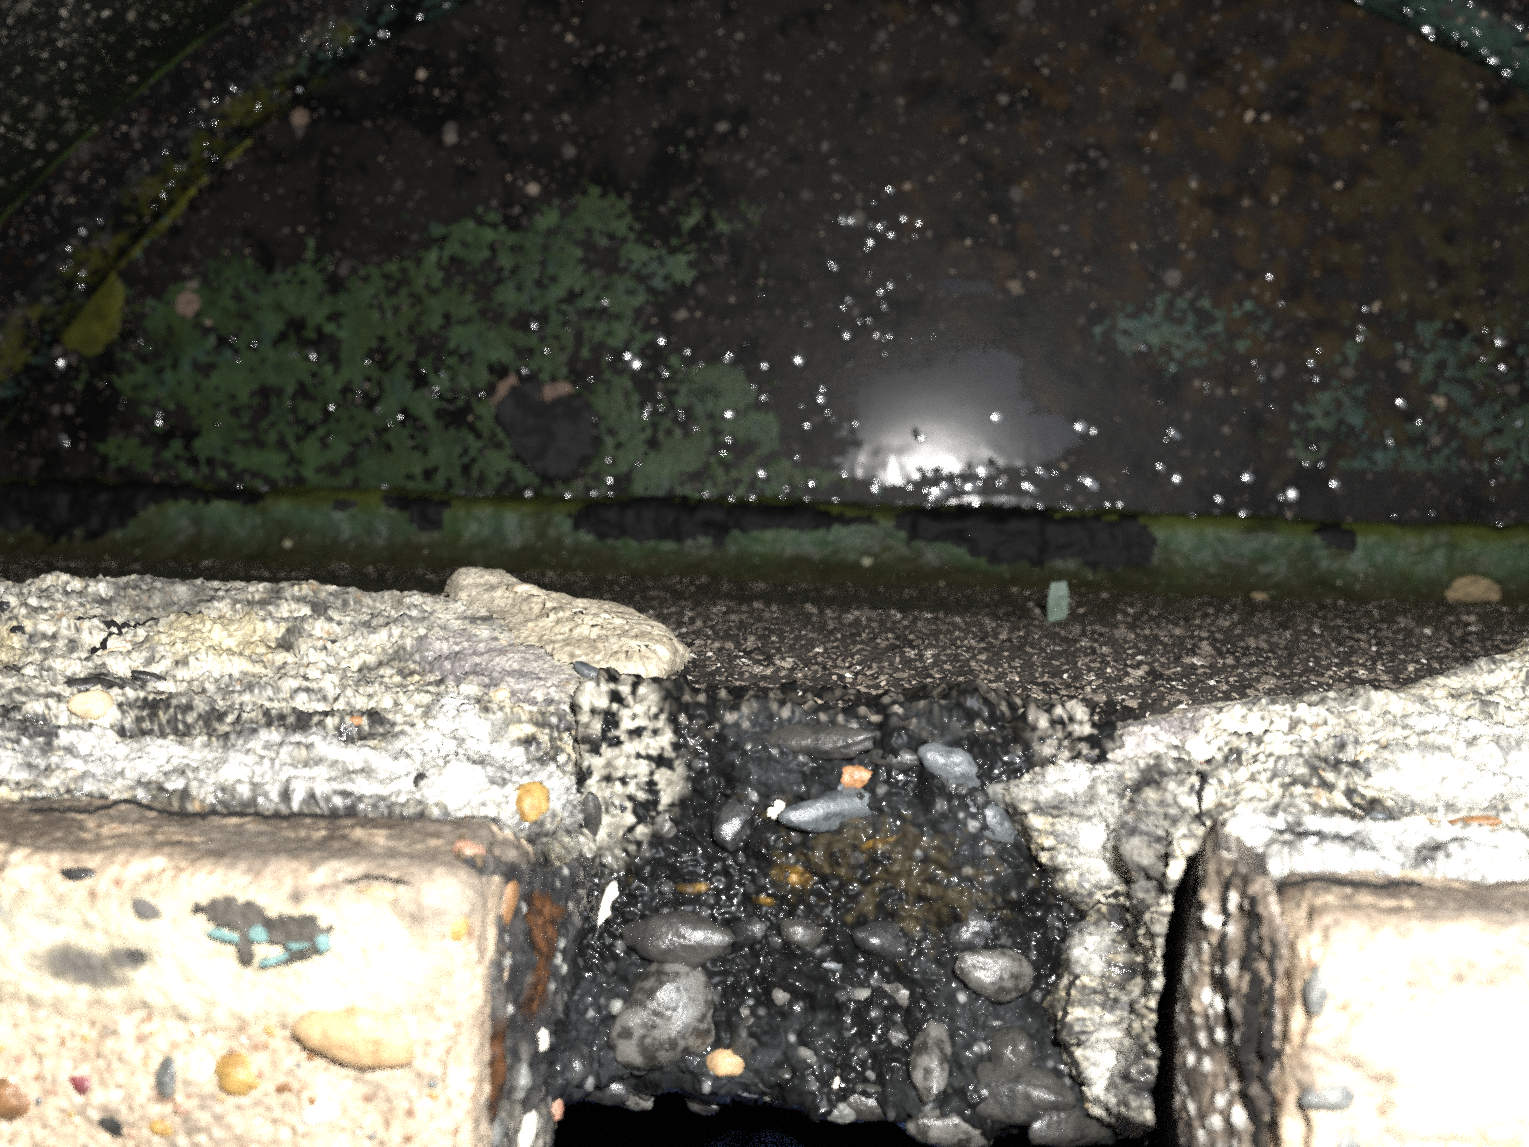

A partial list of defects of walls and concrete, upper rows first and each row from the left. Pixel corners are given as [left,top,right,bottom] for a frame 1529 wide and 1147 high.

spalling [547,667,1145,1147]